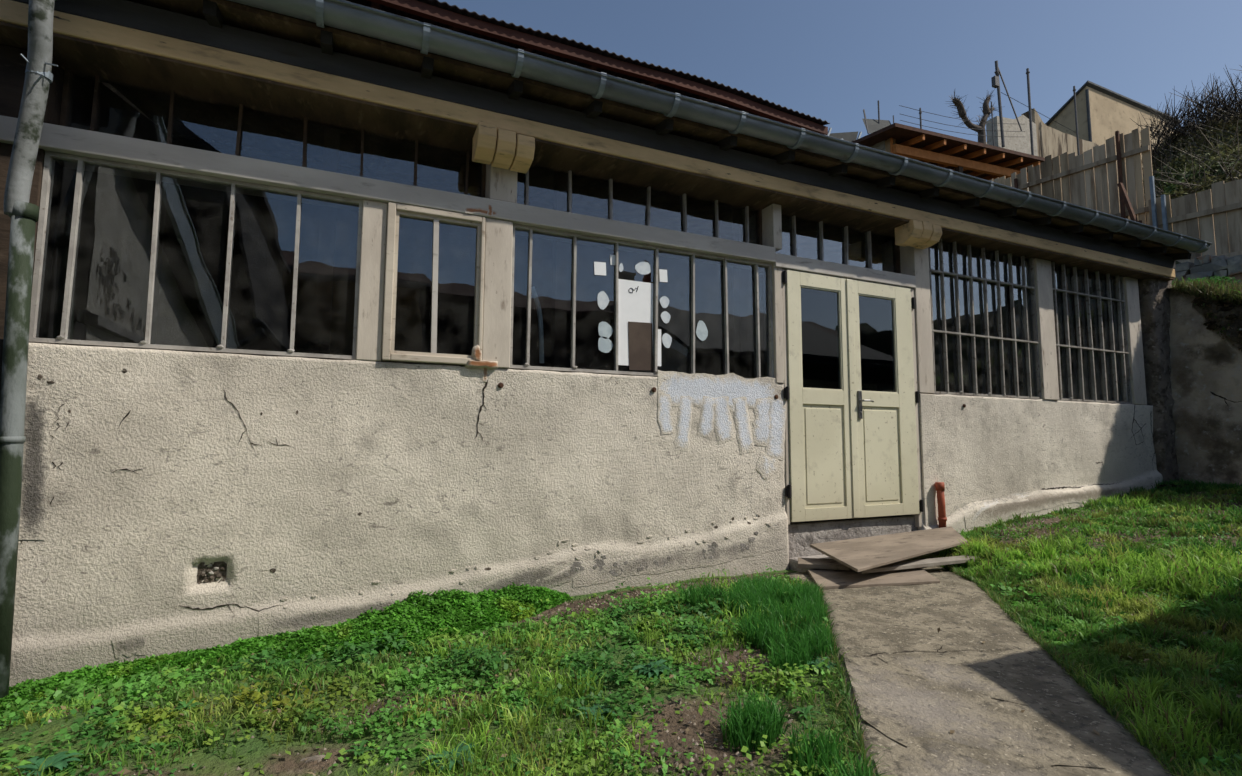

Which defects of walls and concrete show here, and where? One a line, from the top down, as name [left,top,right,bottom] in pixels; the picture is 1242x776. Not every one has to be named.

crack [222,389,292,457]
crack [475,380,488,445]
crack [179,604,277,615]
leakage [258,522,894,637]
leakage [112,634,148,659]